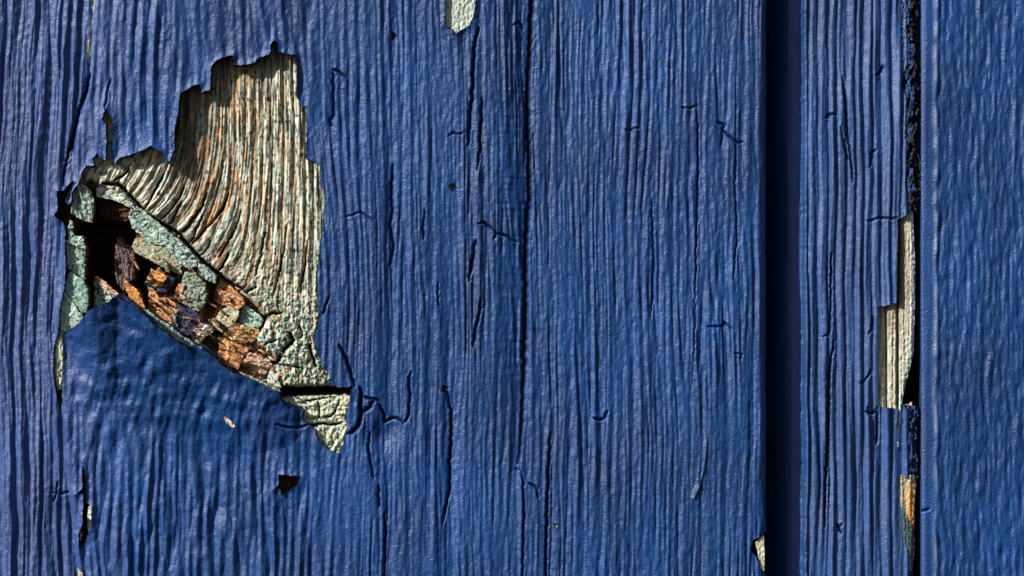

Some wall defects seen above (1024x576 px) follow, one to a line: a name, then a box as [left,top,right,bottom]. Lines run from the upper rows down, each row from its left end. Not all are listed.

peeling [444,0,476,35]
peeling [54,42,352,453]
peeling [876,0,921,571]
peeling [276,474,300,494]
crack [339,344,412,576]